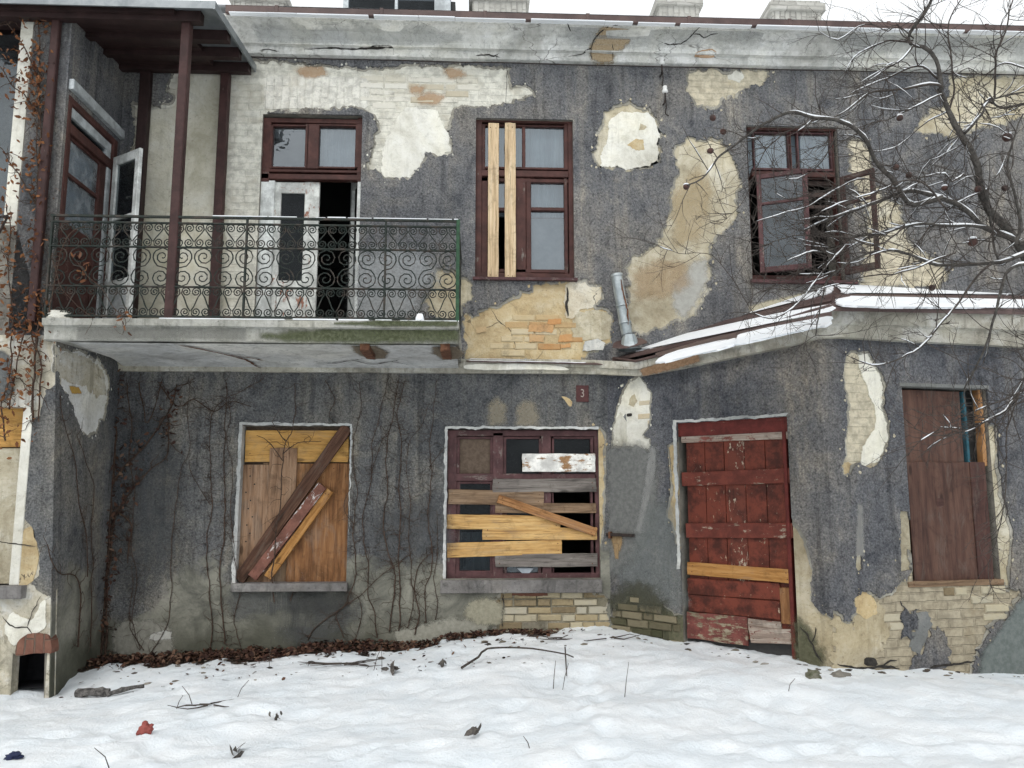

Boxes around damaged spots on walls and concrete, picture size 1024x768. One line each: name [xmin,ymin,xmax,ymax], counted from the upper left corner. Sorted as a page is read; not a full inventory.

crack [568,24,617,58]
crack [664,27,718,45]
peeling [685,49,775,111]
peeling [138,58,537,319]
peeling [591,98,746,336]
peeling [421,266,614,371]
peeling [51,344,112,439]
peeling [839,347,896,477]
peeling [592,376,653,559]
flaking render [792,424,1022,674]
peeling [4,600,47,646]
flaking render [395,593,684,647]